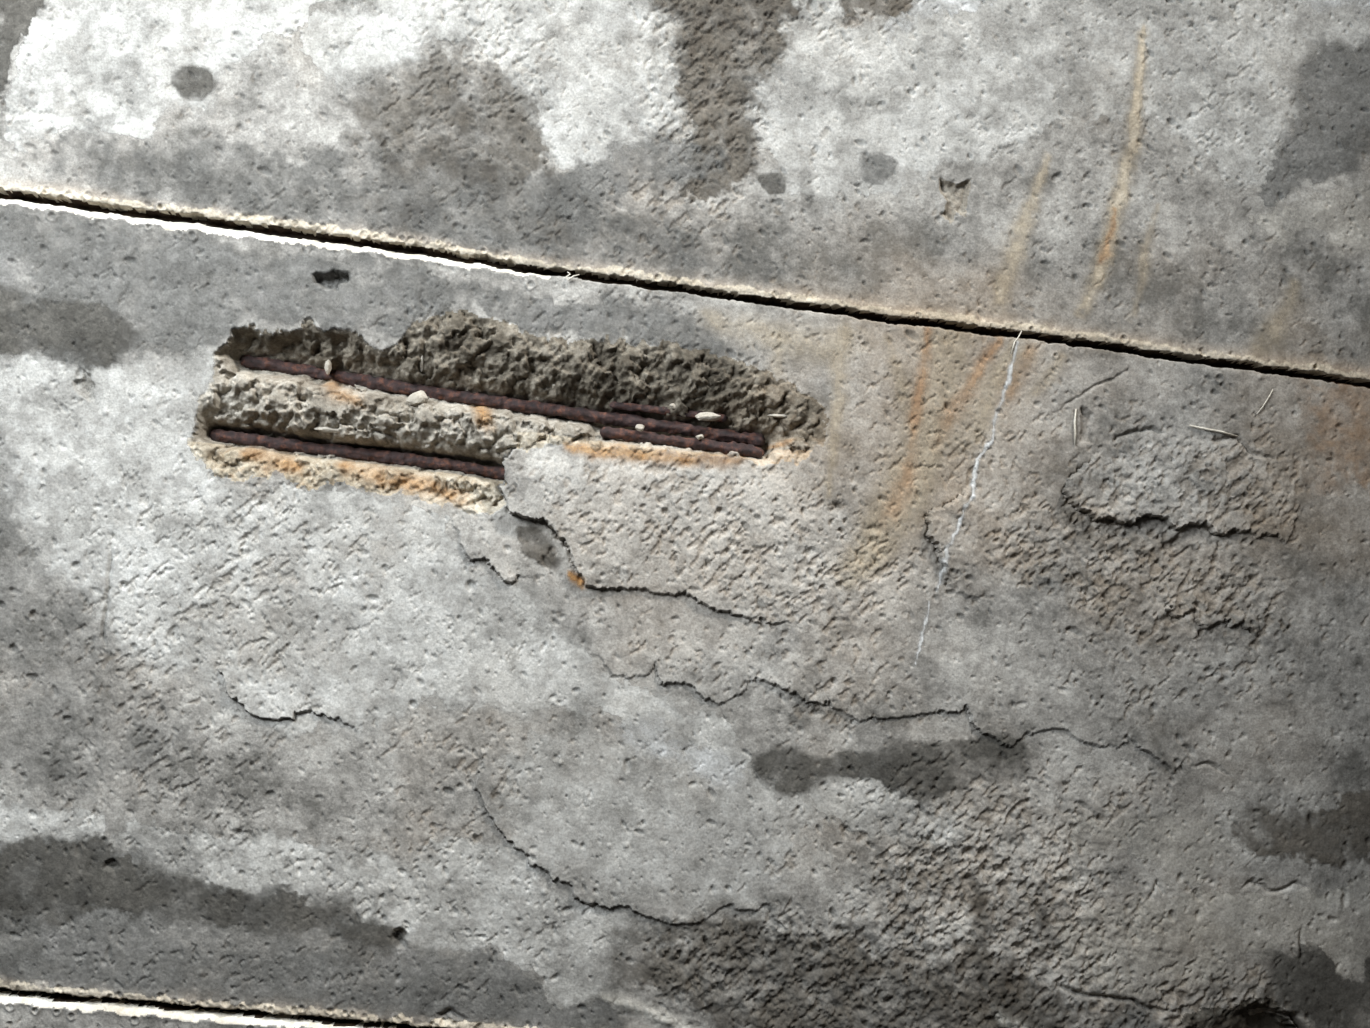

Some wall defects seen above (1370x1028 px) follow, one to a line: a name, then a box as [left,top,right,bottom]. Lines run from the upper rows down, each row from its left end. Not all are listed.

damp [0,0,1370,276]
rust [995,157,1049,303]
rust [1080,26,1146,309]
spalling [187,309,830,583]
damp [0,209,1029,1028]
crack [497,447,799,625]
crack [589,655,1231,777]
rust [847,328,1028,575]
crack [915,341,1018,664]
crack [1061,426,1286,546]
damp [921,941,1067,1028]
damp [1055,790,1370,1028]